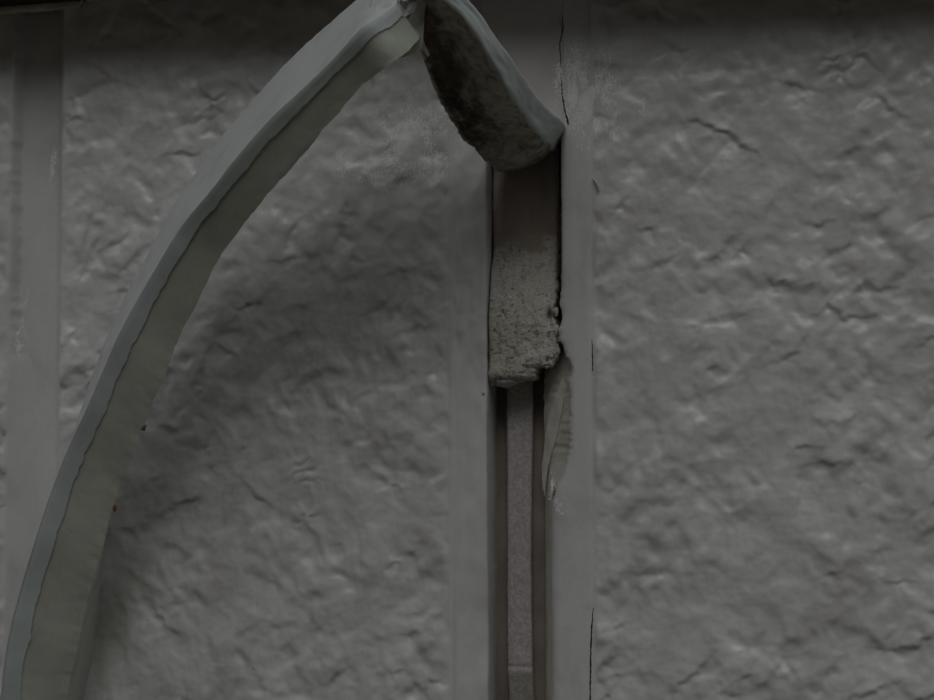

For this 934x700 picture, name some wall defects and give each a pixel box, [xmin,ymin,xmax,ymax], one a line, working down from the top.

peeling [0,0,566,700]
crack [556,14,569,284]